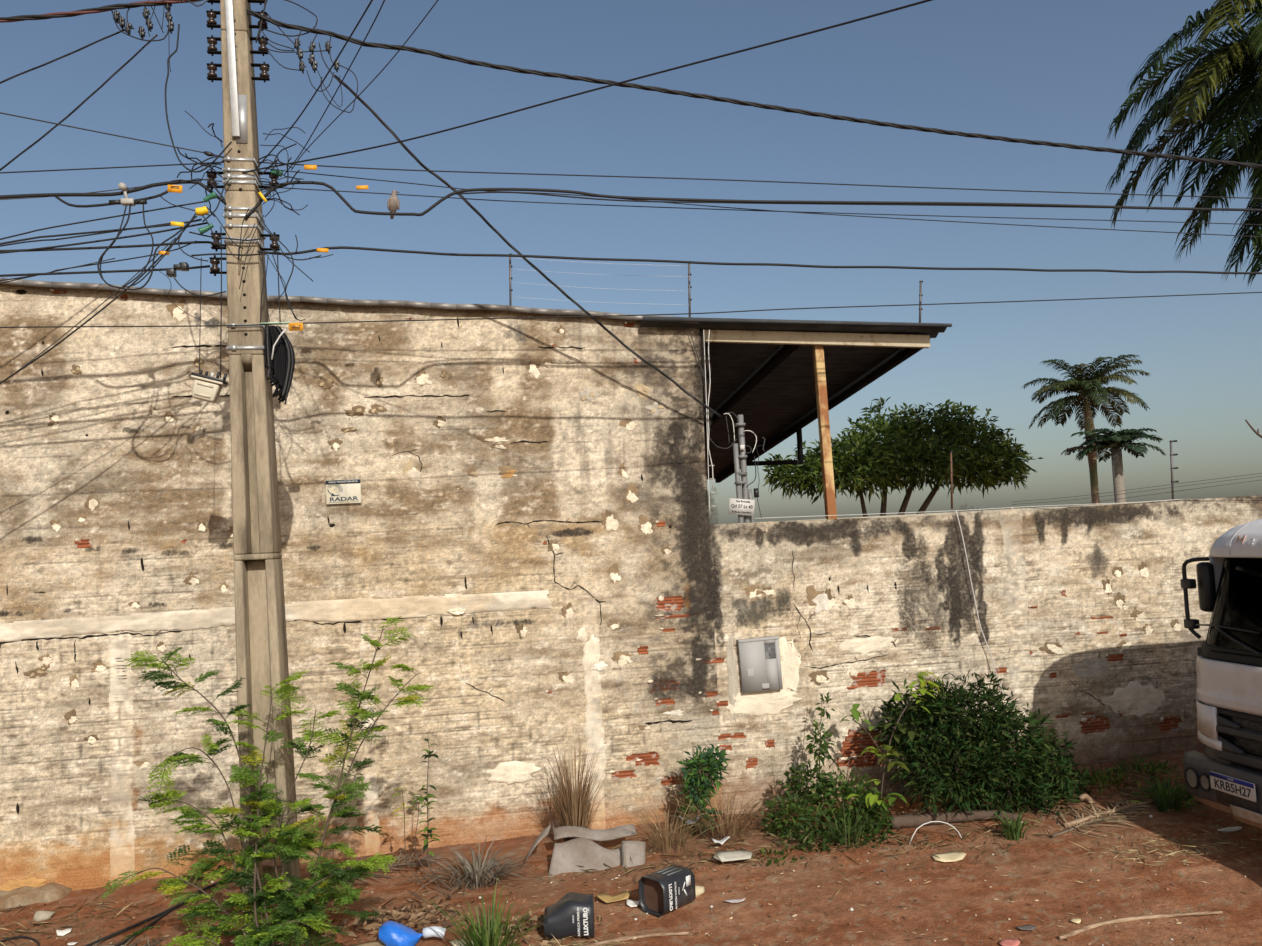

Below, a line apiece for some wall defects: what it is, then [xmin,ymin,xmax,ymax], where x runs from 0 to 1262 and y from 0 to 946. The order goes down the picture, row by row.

leakage [650,331,989,699]
crack [496,520,606,625]
peeling [647,679,684,716]
flaking render [698,691,728,717]
peeling [794,656,830,686]
flaking render [847,670,886,690]
flaking render [609,751,685,786]
flaking render [714,733,747,751]
flaking render [745,739,775,769]
flaking render [836,728,889,768]